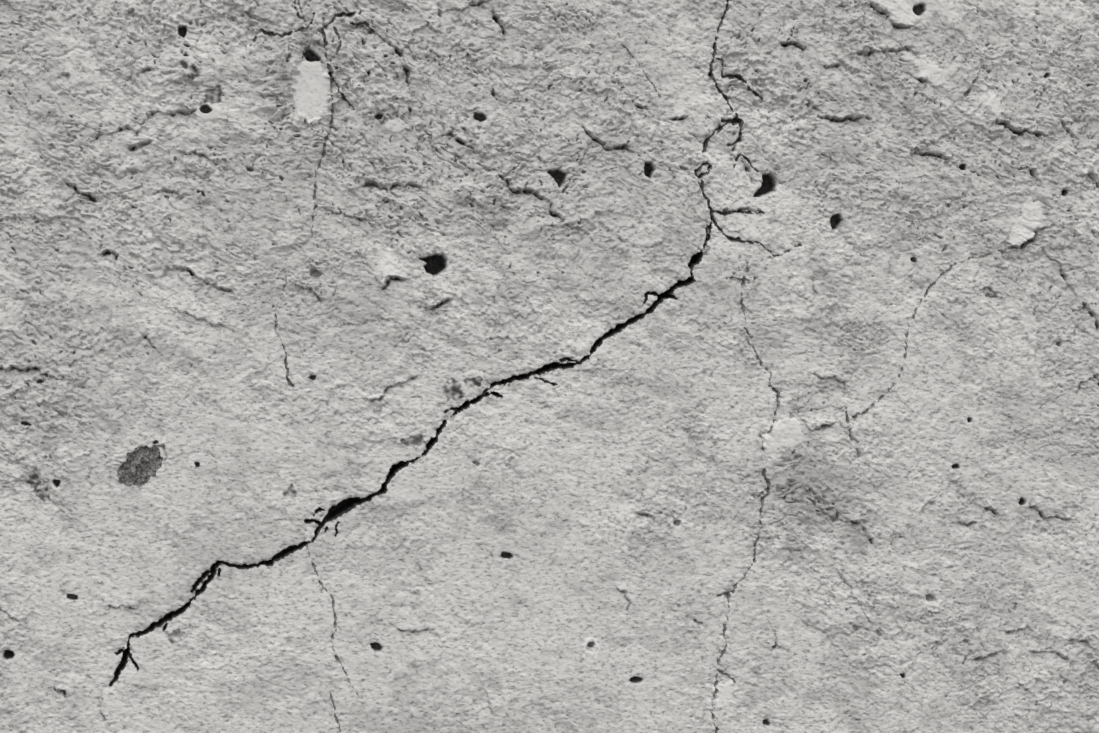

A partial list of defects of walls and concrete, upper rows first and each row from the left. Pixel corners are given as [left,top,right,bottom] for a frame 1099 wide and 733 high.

crack [109,0,802,733]